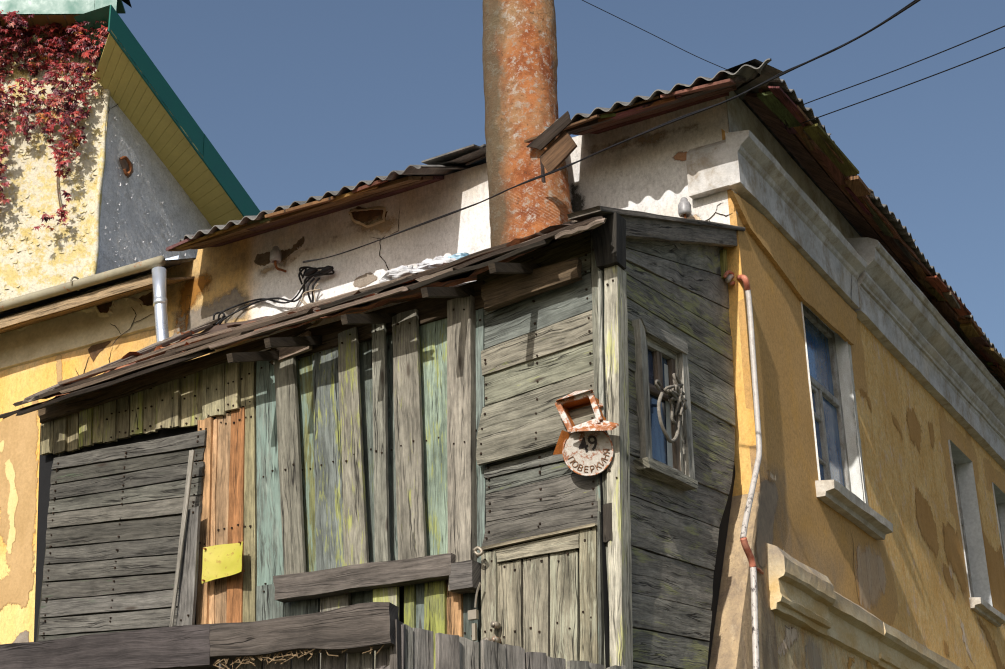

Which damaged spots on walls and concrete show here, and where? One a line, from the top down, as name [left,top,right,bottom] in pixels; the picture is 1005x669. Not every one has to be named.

peeling [0,99,98,263]
damp [570,183,585,221]
spalling [254,236,305,266]
spalling [77,272,152,296]
spalling [81,289,154,318]
corrosion [176,273,211,334]
damp [173,287,247,343]
spalling [83,341,111,374]
peeling [891,407,935,454]
peeling [0,400,39,610]
peeling [915,487,967,601]
spalling [13,630,29,643]